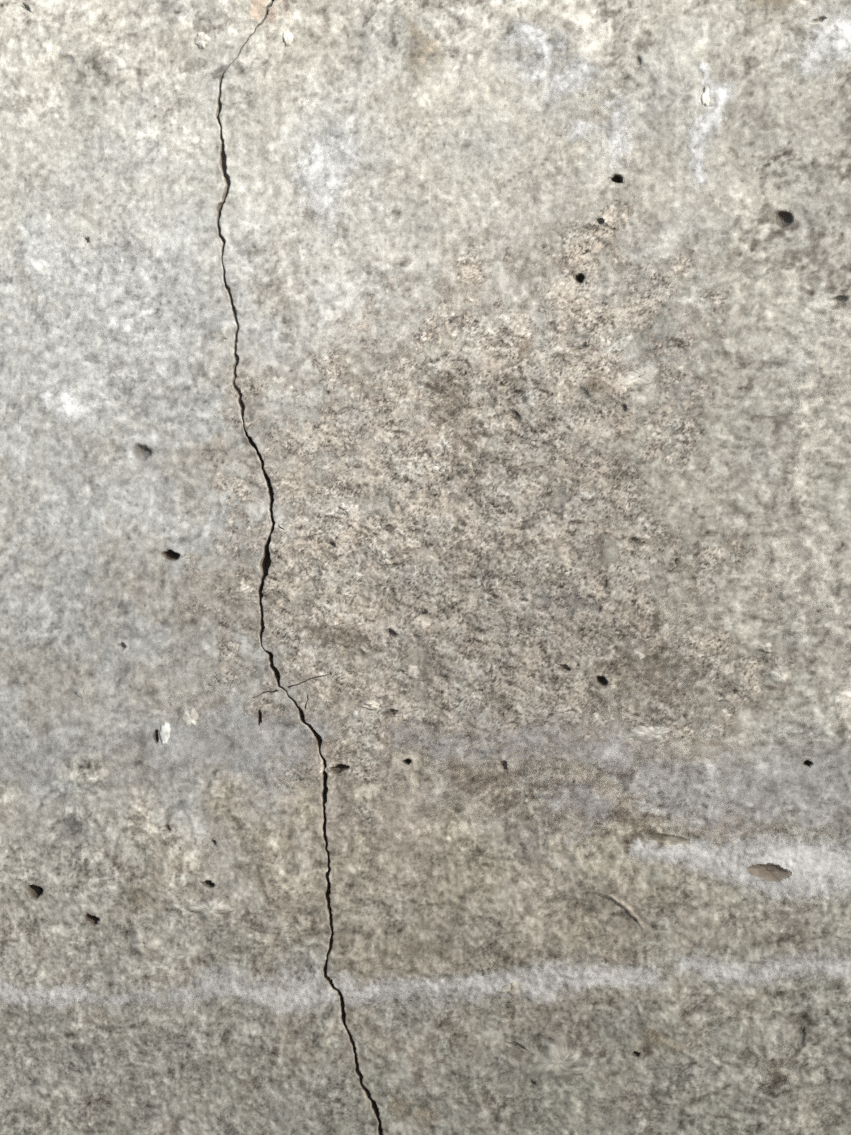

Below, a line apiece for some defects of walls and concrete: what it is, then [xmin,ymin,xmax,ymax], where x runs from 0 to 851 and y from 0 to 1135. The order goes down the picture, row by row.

crack [212,0,386,1135]